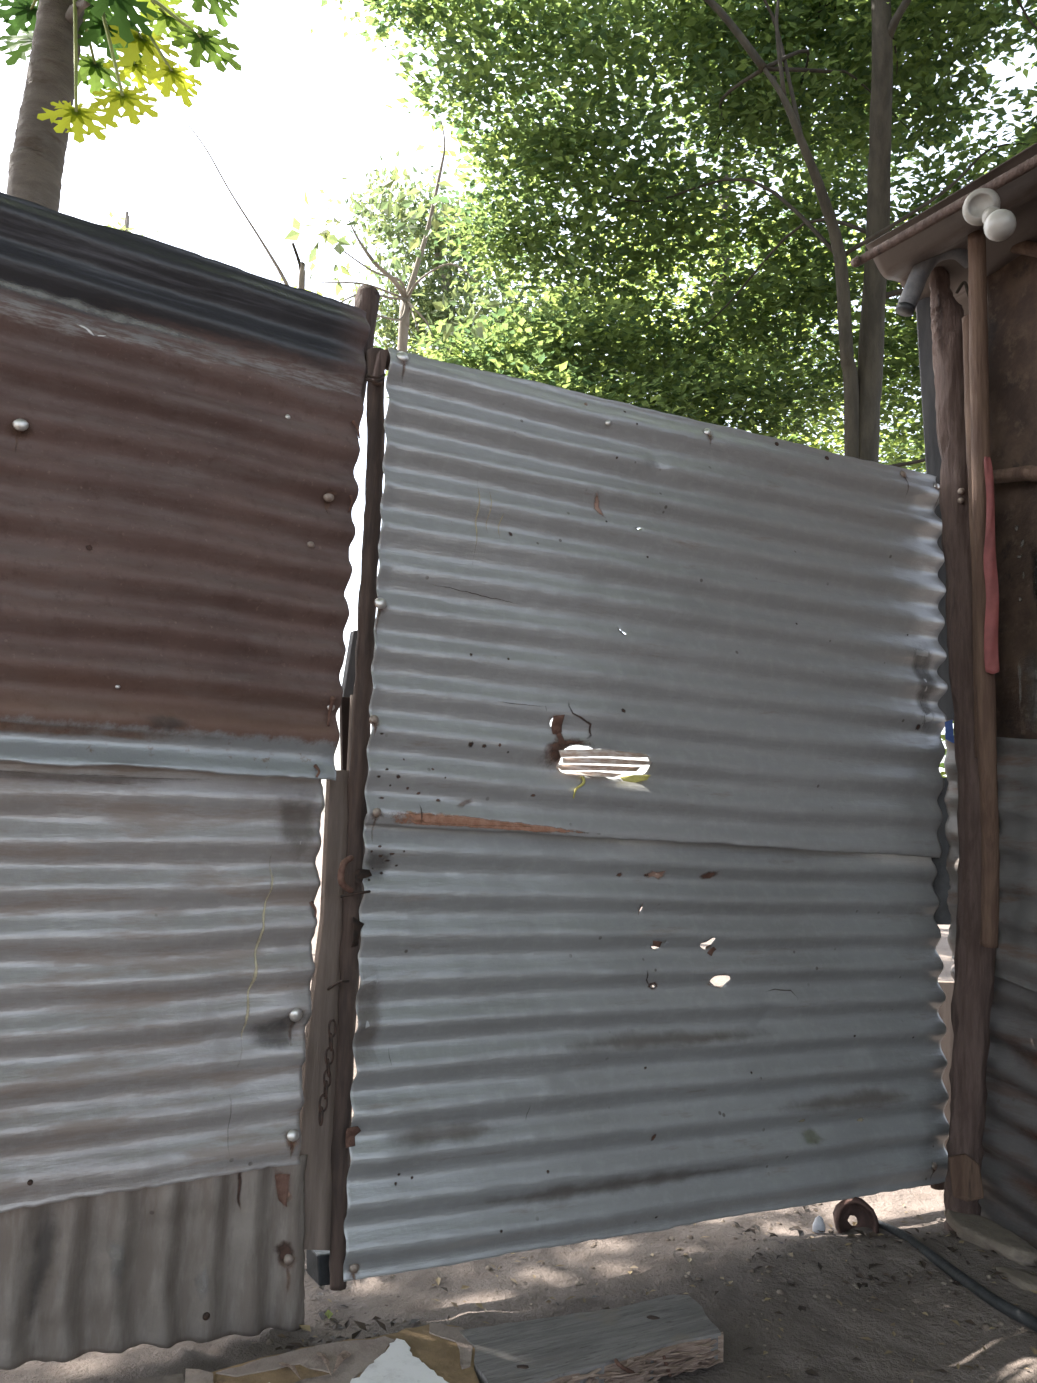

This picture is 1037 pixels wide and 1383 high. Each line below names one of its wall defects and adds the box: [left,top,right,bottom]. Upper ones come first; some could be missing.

rust [0,722,92,734]
peeling [551,715,565,734]
rust [377,758,585,833]
rust [354,822,405,887]